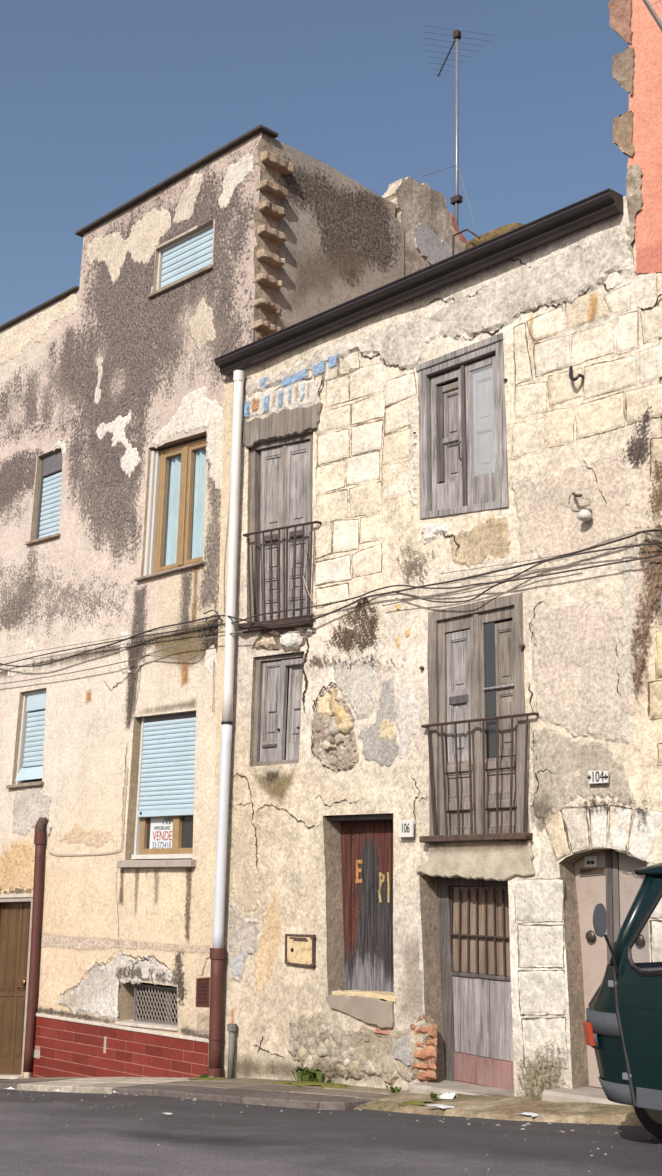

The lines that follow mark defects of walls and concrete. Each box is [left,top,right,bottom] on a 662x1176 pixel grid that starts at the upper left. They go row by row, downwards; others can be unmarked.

peeling [87,173,204,285]
leakage [277,153,400,289]
peeling [96,411,141,478]
leakage [0,142,257,728]
peeling [152,386,223,493]
leakage [243,383,309,417]
leakage [620,403,662,699]
mould [304,587,405,672]
peeling [421,455,639,819]
spalling [252,627,419,773]
crack [231,773,362,871]
spalling [57,947,176,1021]